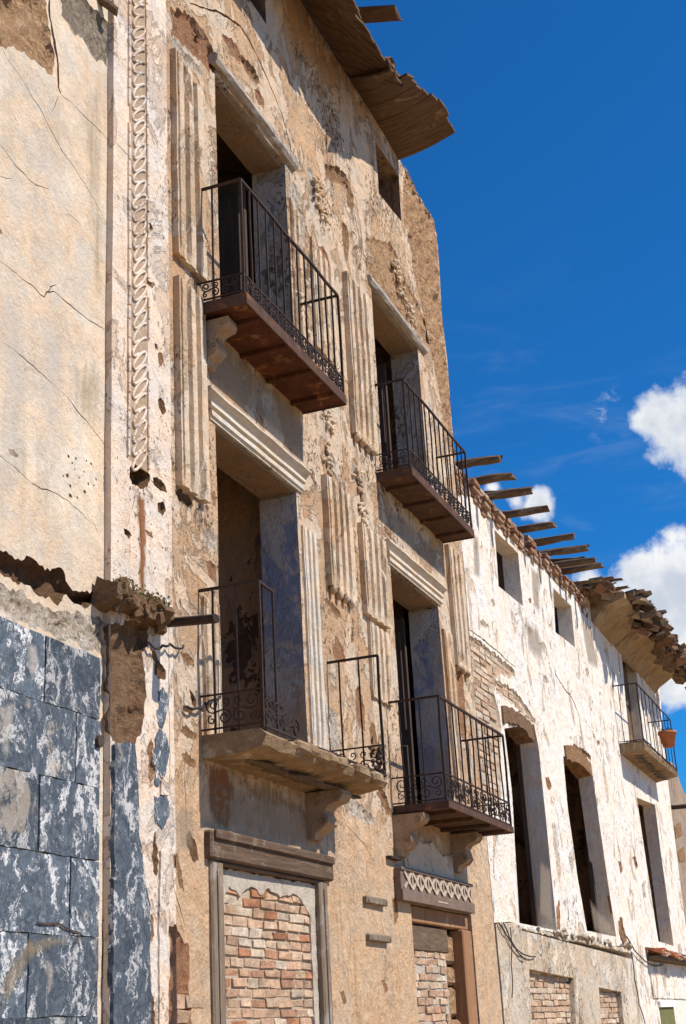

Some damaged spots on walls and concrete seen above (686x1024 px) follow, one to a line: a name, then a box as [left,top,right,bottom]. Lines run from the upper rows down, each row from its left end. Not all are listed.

crack [2,0,128,225]
spalling [170,6,216,76]
spalling [222,34,264,109]
crack [1,262,105,330]
crack [5,343,104,444]
spalling [129,466,193,516]
rust [138,497,146,595]
spalling [571,576,686,689]
spalling [103,620,166,787]
spalling [180,689,197,768]
flaking render [456,619,536,812]